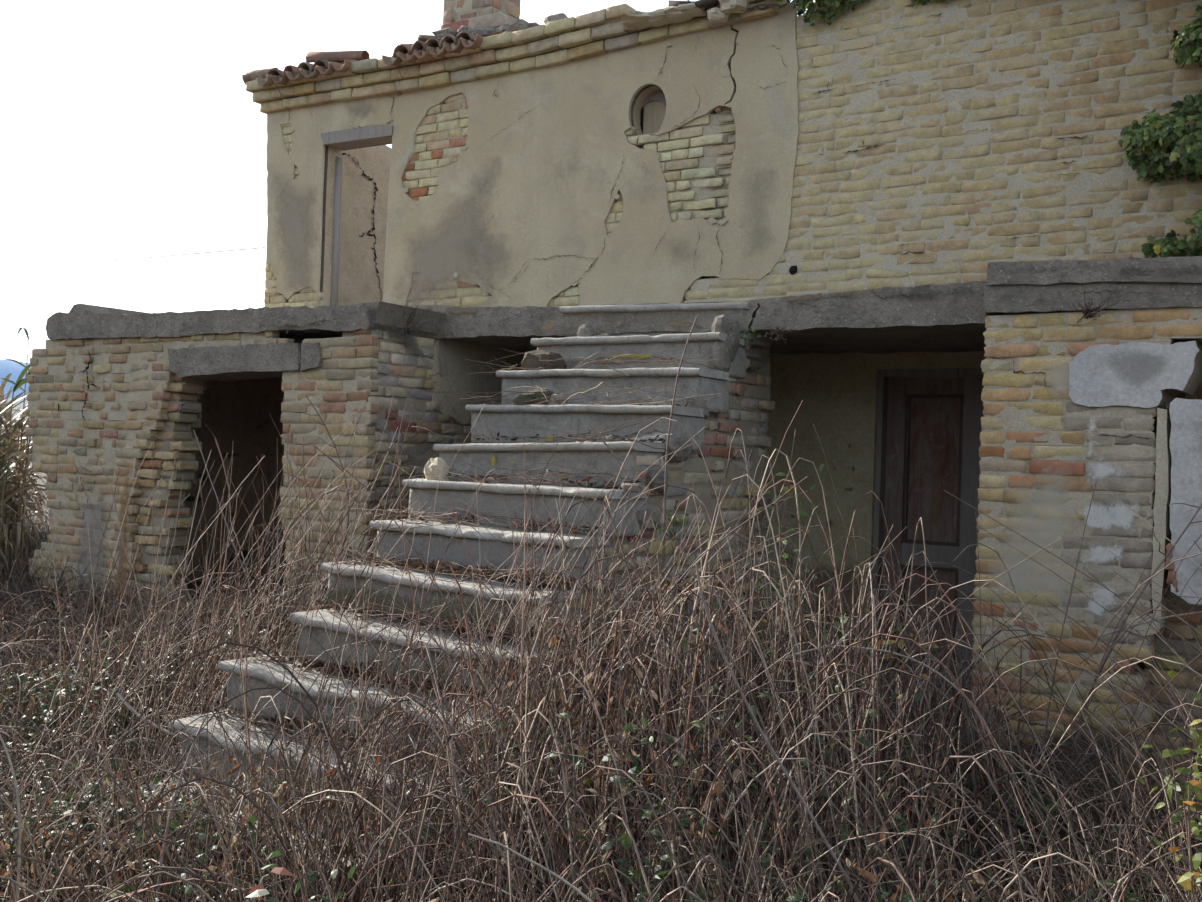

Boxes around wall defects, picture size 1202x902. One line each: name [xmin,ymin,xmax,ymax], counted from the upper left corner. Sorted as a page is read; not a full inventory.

crack [673,28,788,128]
crack [342,67,404,302]
flaking render [402,93,469,201]
flaking render [625,106,736,226]
crack [486,239,605,296]